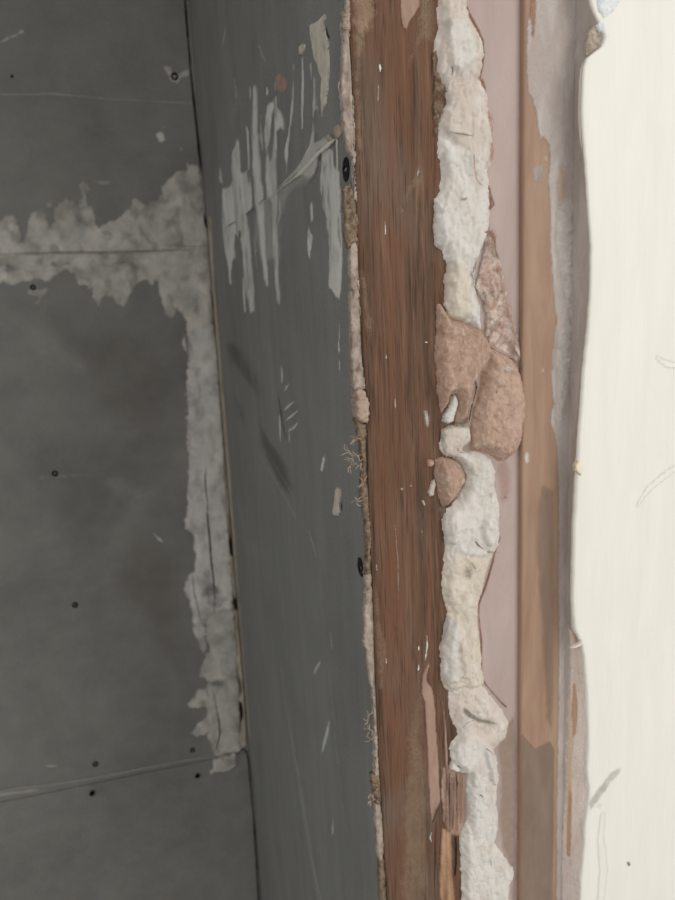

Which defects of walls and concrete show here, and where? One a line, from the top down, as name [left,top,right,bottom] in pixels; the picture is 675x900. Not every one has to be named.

peeling [467,7,494,160]
peeling [473,152,495,210]
spalling [299,0,388,900]
peeling [521,0,619,900]
peeling [478,541,500,670]
spalling [434,774,458,877]